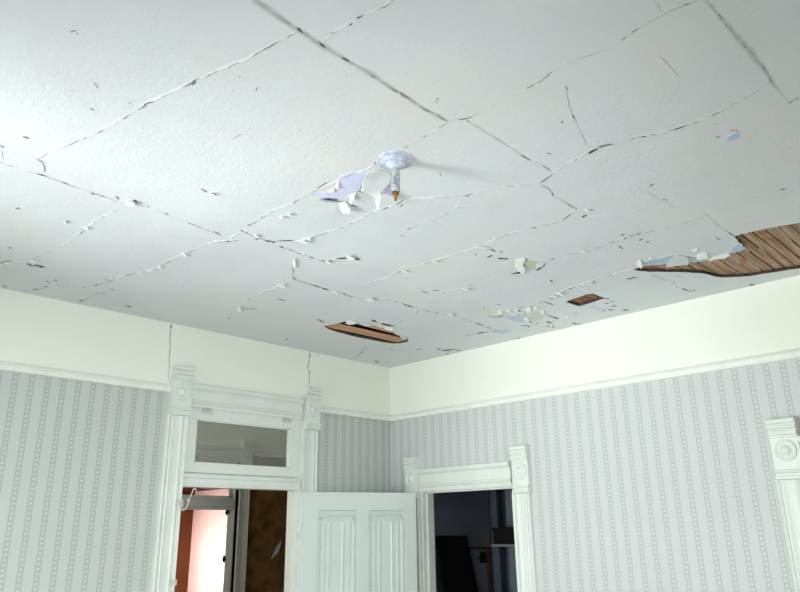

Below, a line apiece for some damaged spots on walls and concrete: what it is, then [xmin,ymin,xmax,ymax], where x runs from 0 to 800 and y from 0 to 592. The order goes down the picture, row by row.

crack [0,0,800,338]
peeling [312,170,392,214]
peeling [487,249,546,274]
spalling [633,222,800,278]
crack [166,324,174,383]
spalling [324,320,408,350]
peeling [481,301,580,339]
spalling [567,294,628,311]